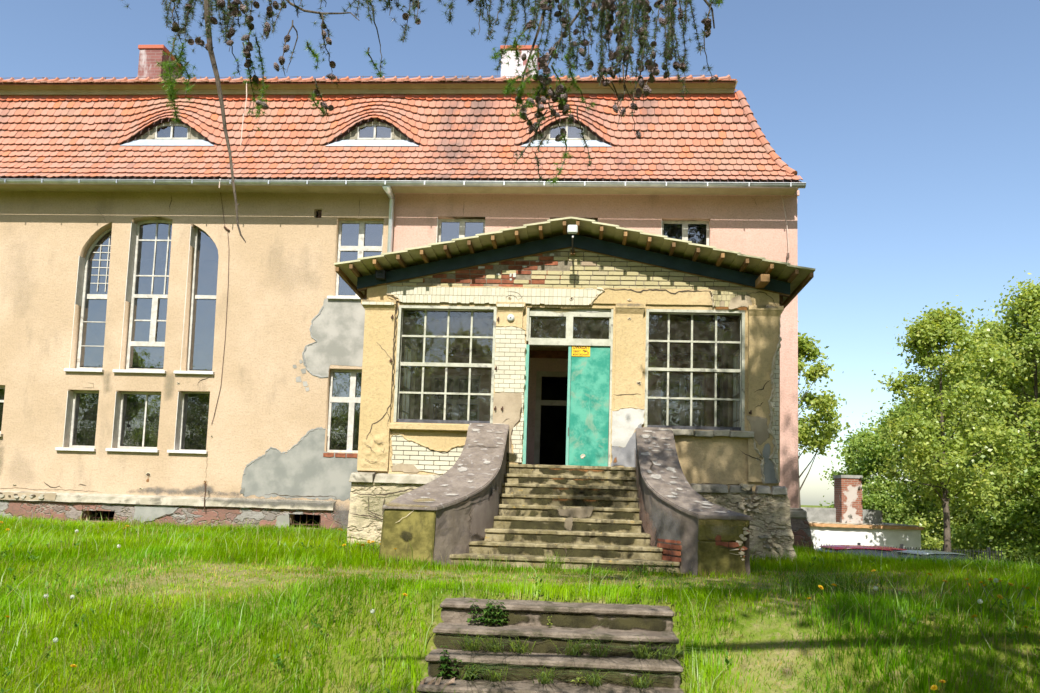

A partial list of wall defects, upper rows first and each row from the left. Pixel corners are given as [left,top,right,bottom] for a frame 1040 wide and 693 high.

flaking render [362,253,609,313]
crack [366,295,398,440]
flaking render [389,433,465,474]
peeling [611,407,682,562]
flaking render [737,315,782,512]